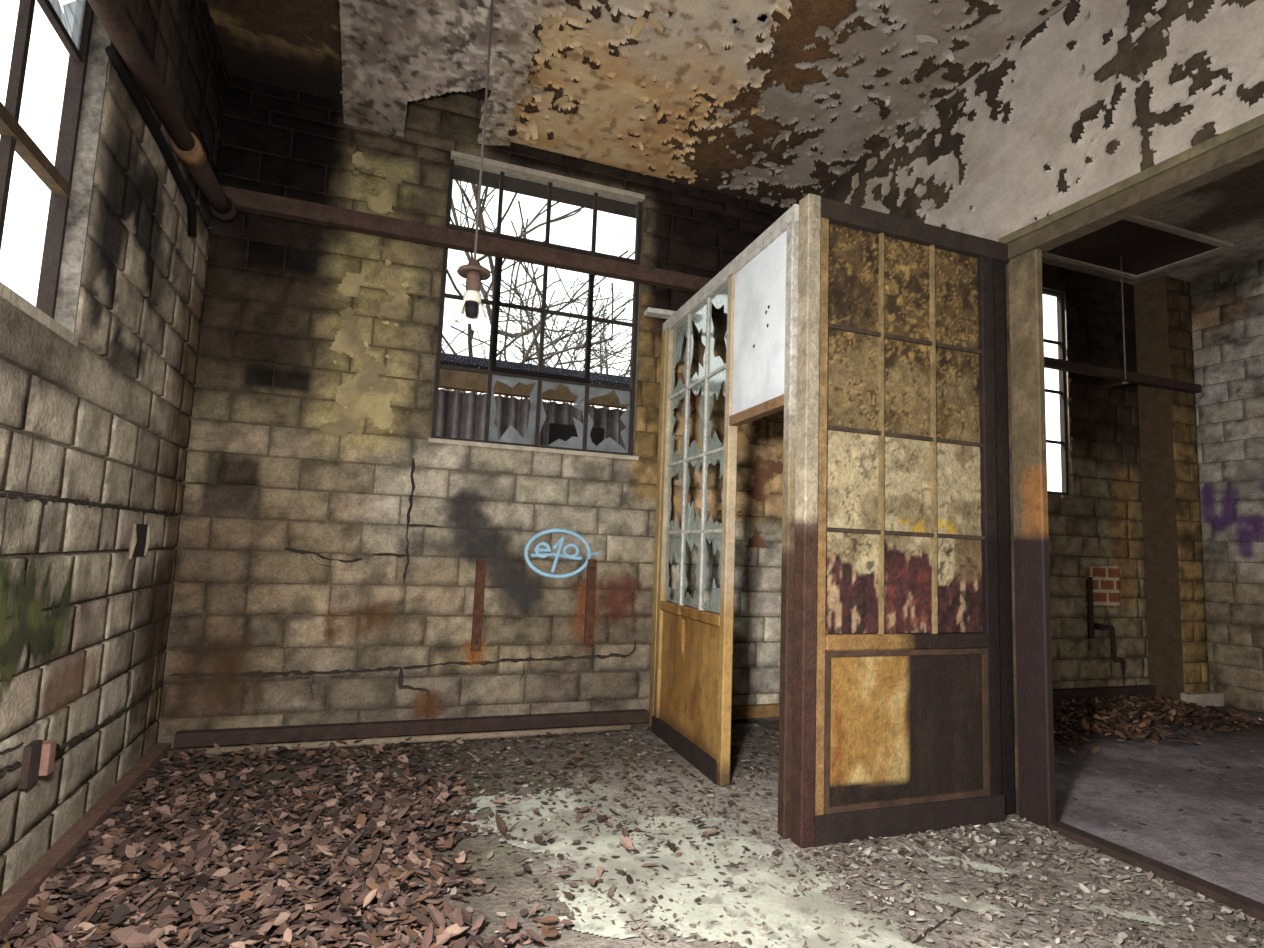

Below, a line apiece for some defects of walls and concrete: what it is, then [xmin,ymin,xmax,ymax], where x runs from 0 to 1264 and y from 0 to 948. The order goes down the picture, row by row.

peeling [509,0,1264,242]